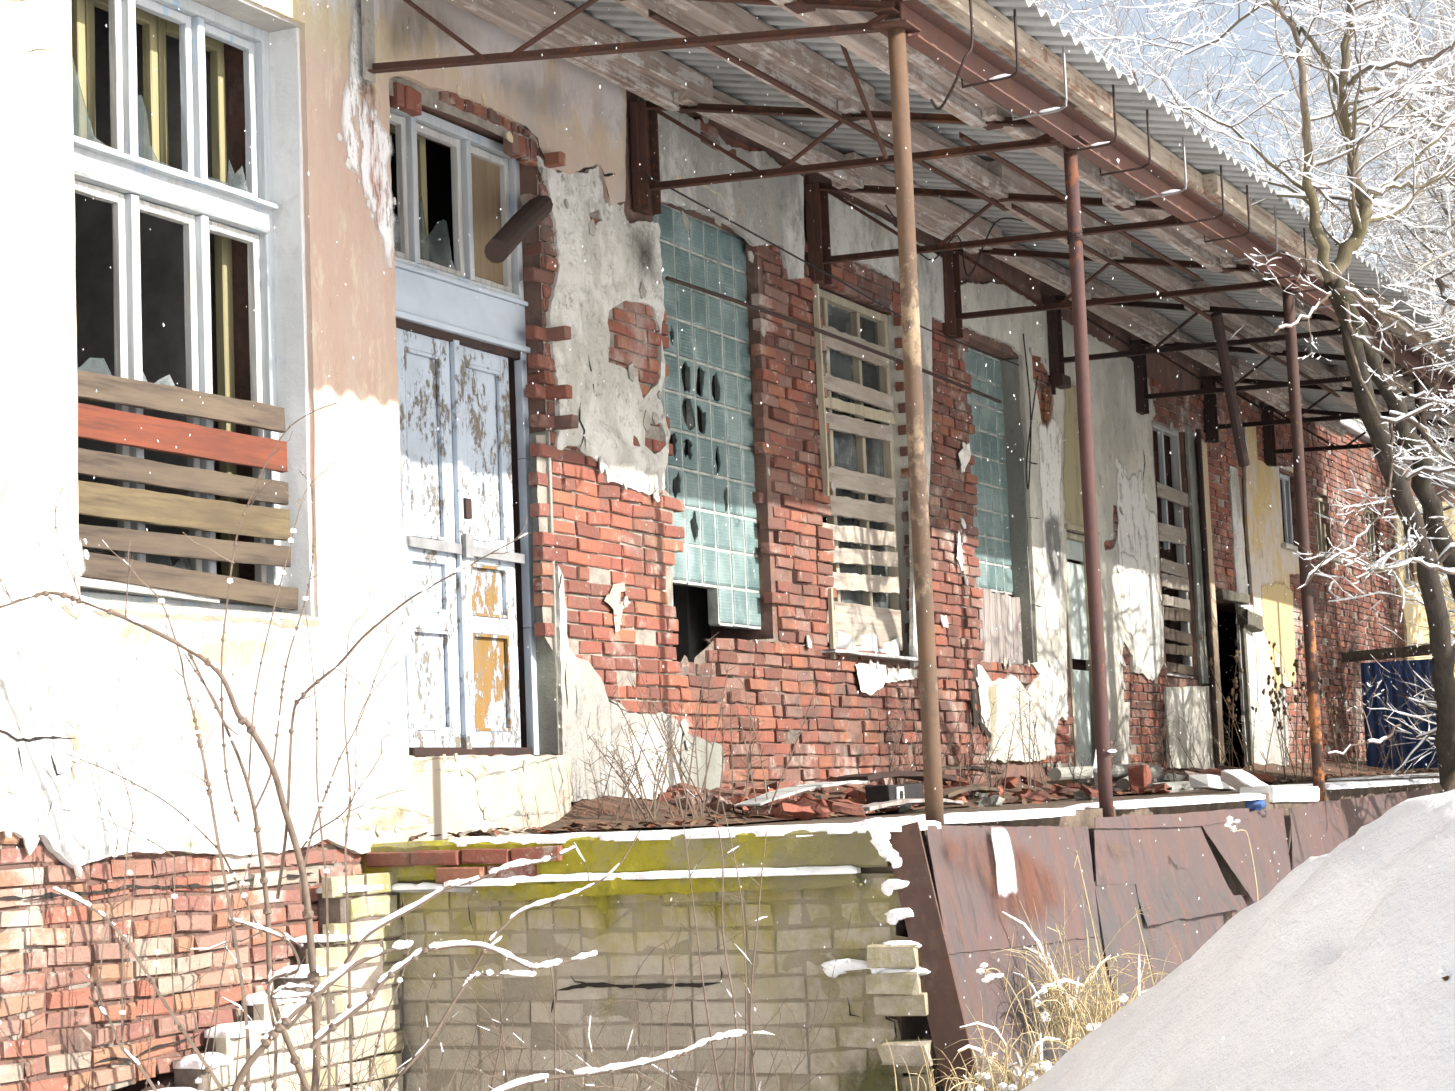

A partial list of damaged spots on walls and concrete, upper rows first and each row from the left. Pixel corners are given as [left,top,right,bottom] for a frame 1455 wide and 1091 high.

flaking render [337,0,923,792]
flaking render [928,318,1074,784]
peeling [1029,348,1084,635]
peeling [1104,458,1167,770]
flaking render [1148,378,1406,765]
flaking render [0,824,364,1091]
flaking render [342,806,436,837]